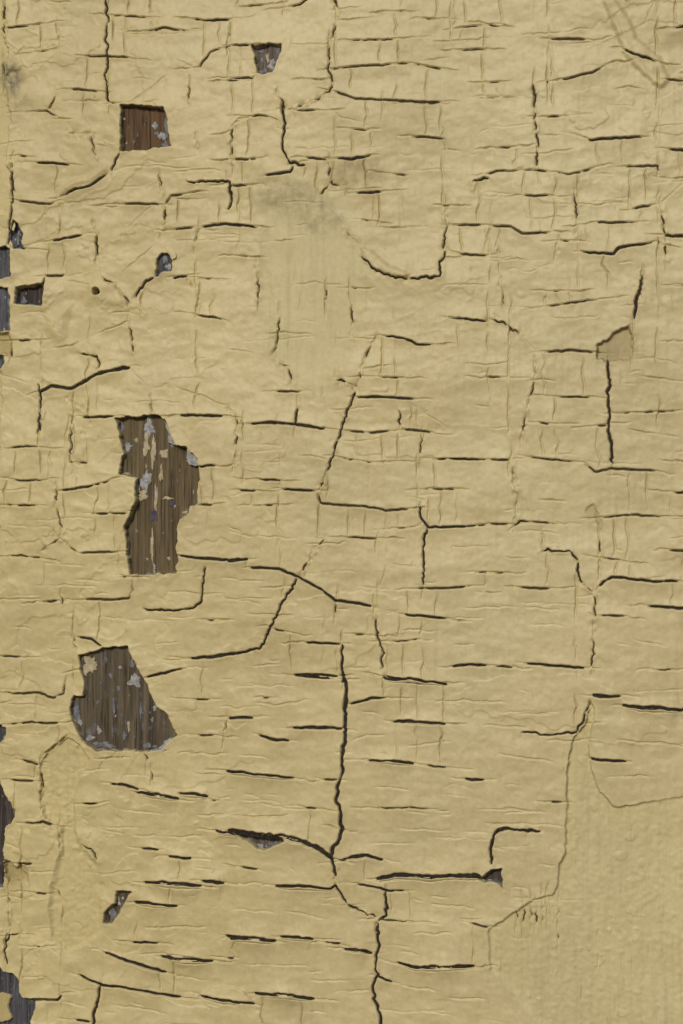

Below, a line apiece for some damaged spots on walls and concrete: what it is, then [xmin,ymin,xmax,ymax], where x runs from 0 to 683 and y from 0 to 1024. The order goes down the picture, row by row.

peeling [0,0,44,454]
peeling [120,105,171,152]
crack [38,0,263,116]
peeling [250,44,282,75]
crack [125,0,440,240]
crack [351,68,683,323]
crack [13,328,134,448]
crack [9,416,115,558]
peeling [115,415,200,576]
crack [44,320,683,1024]
peeling [40,646,177,953]
peeling [0,968,36,1024]